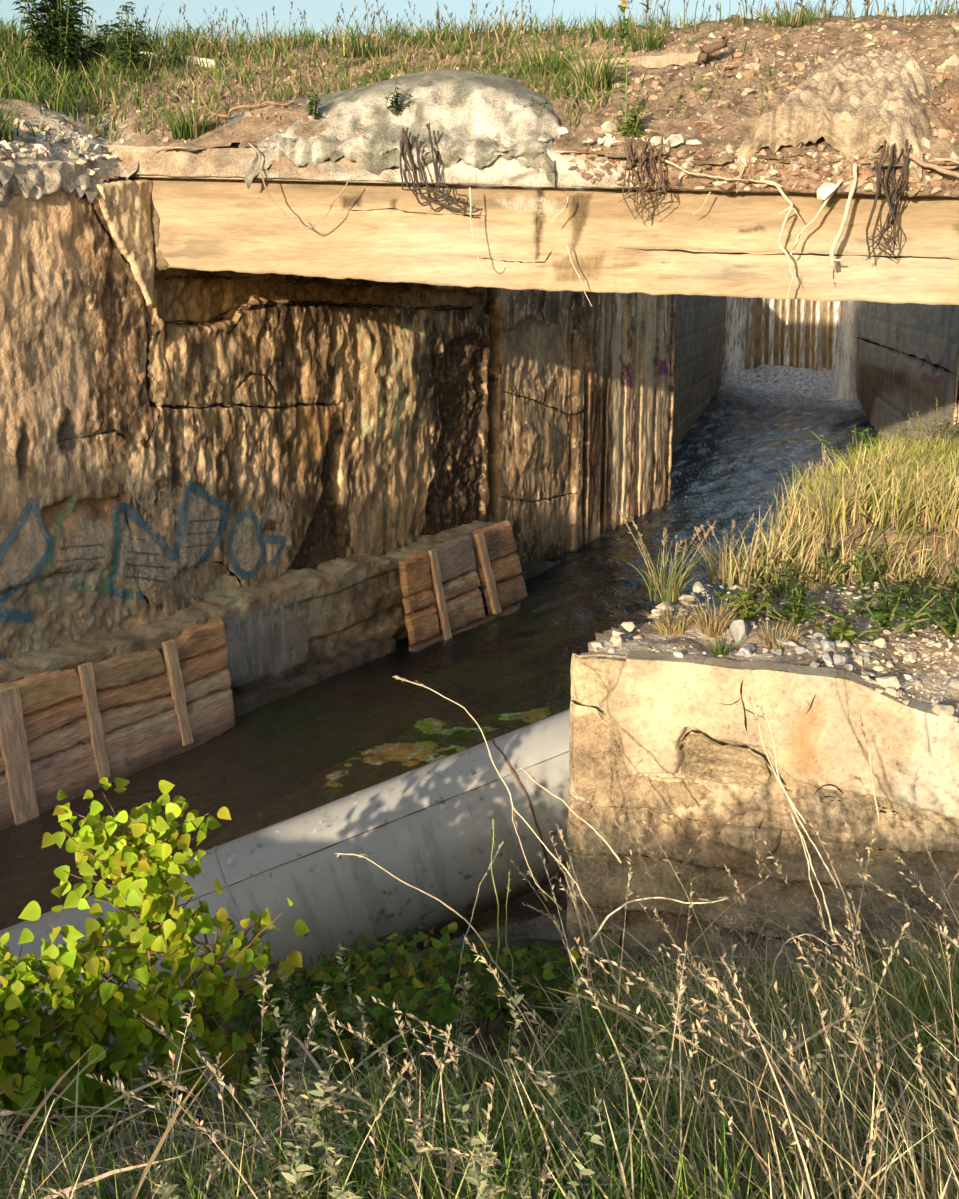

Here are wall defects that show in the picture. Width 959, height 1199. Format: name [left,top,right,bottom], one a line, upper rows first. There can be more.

crack [57,176,483,469]
crack [503,391,583,416]
spalling [41,495,121,529]
crack [508,493,577,503]